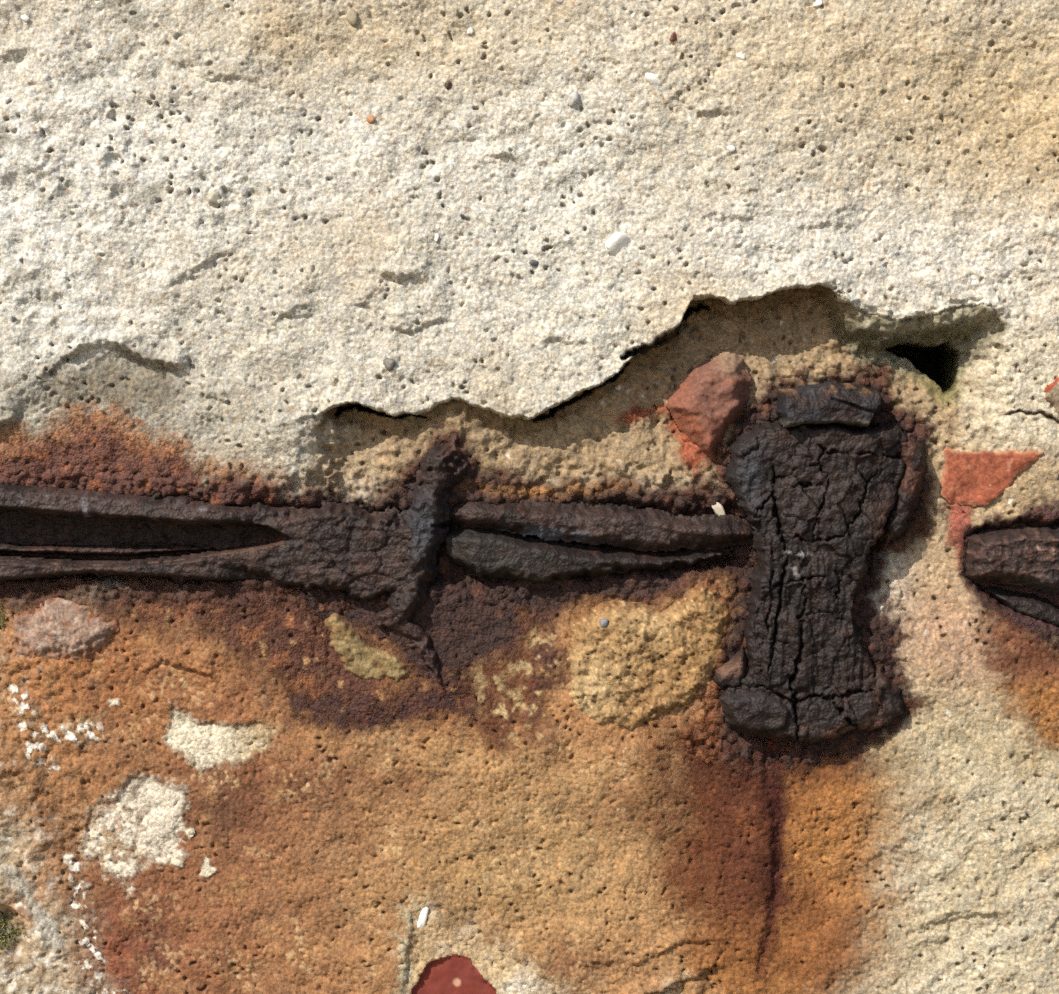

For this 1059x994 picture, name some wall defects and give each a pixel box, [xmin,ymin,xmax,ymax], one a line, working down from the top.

spalling [318,285,1004,438]
peeling [712,502,725,516]
peeling [877,433,928,553]
rust [954,501,1059,747]
rust [0,474,939,994]
peeling [389,891,567,994]
spalling [663,979,688,994]